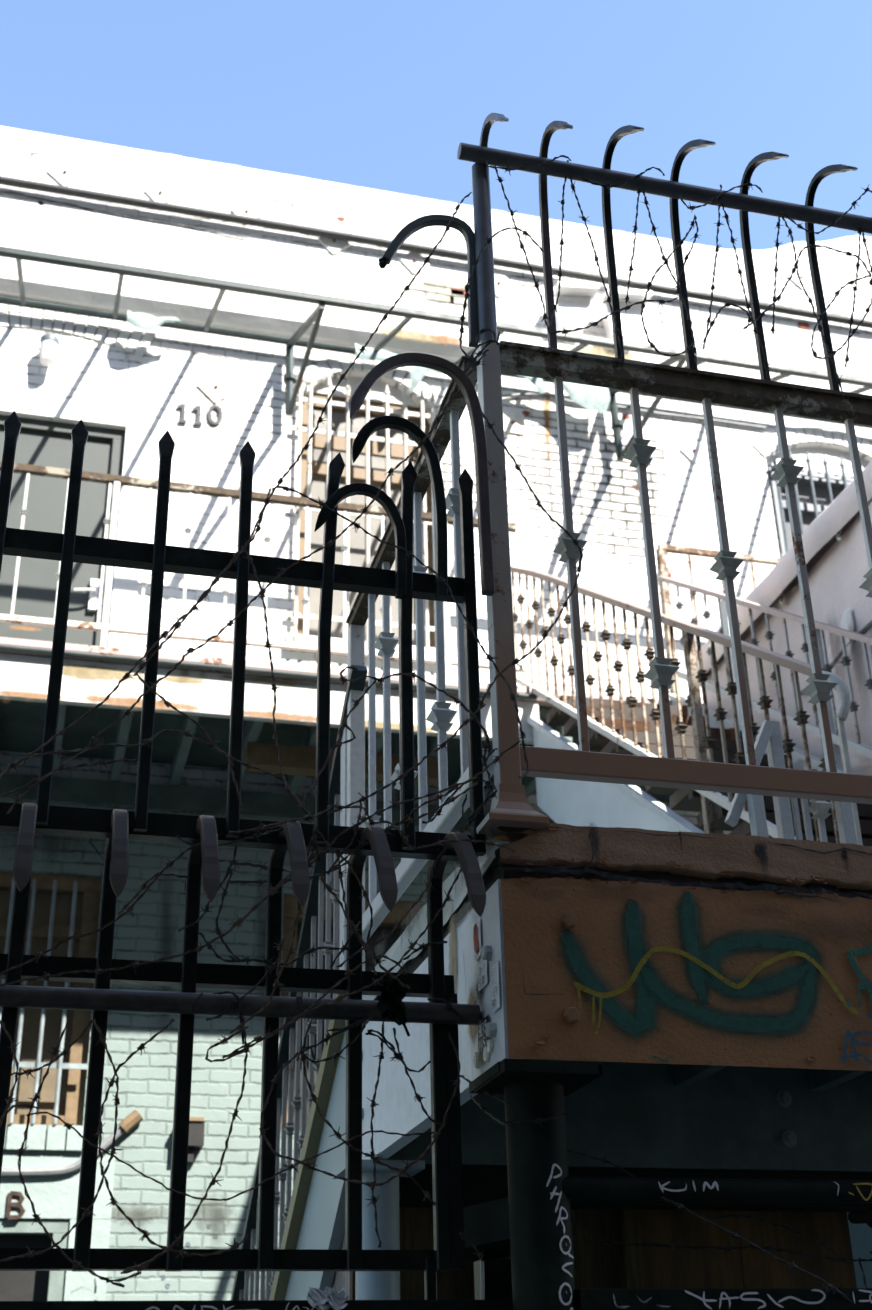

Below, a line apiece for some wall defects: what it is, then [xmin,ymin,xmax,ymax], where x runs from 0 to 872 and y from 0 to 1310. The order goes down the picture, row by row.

crack [498,826,872,903]